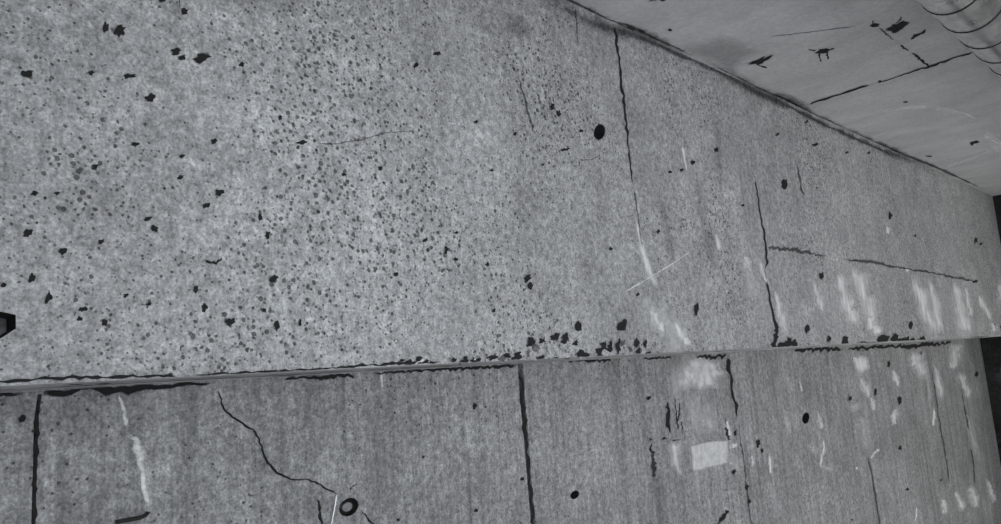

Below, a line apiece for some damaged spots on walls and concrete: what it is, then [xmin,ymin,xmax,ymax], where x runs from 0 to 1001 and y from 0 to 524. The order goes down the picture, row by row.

crack [570,0,683,51]
damp [838,259,998,398]
damp [853,357,875,410]